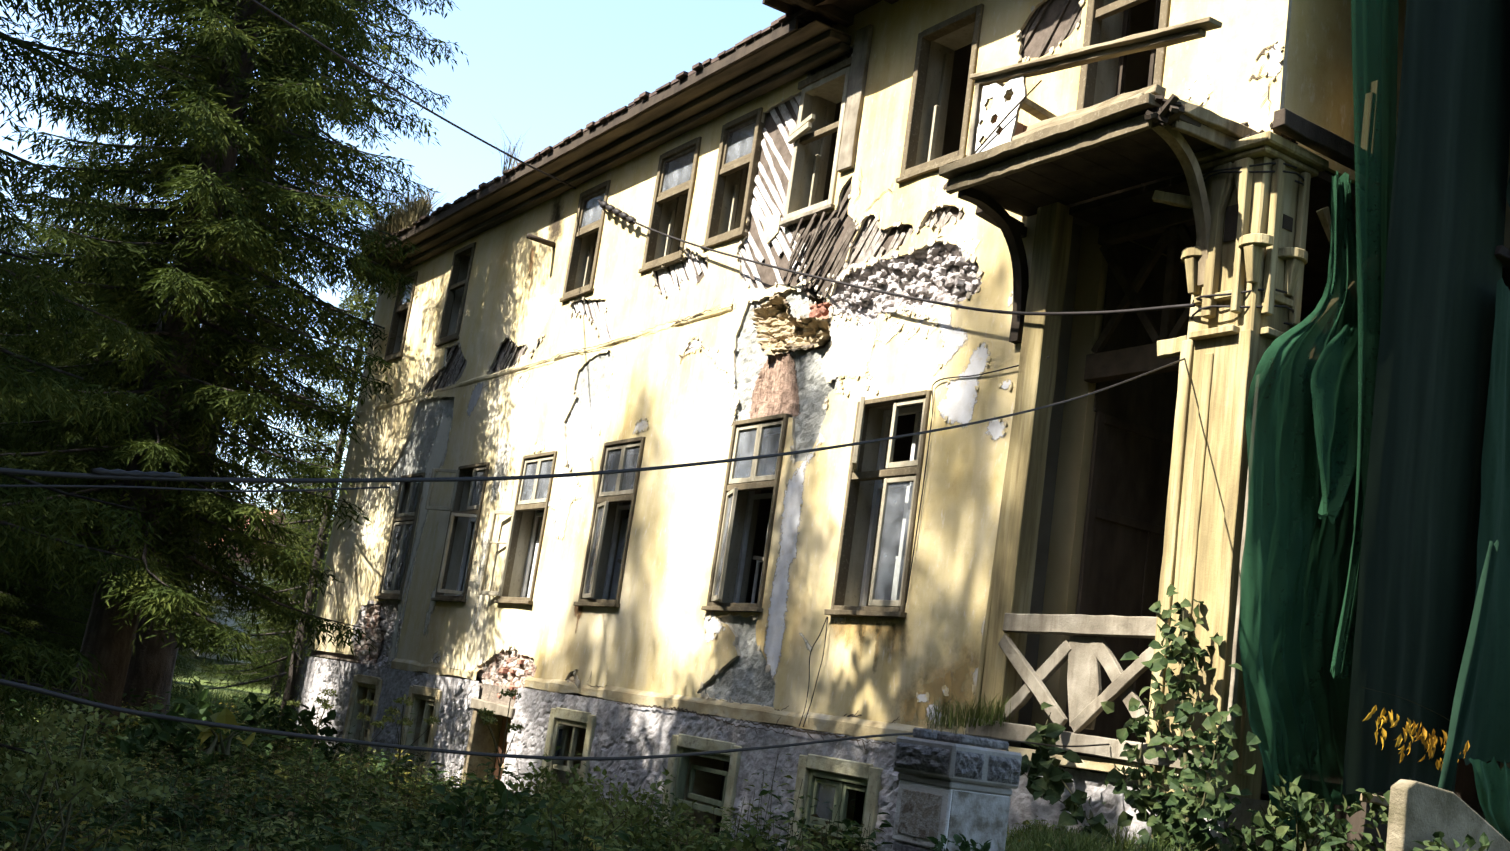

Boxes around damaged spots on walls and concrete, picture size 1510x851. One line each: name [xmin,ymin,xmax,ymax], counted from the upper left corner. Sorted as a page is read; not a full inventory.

flaking render [390,334,545,494]
flaking render [548,297,614,539]
flaking render [700,202,1007,708]
spalling [477,643,536,699]